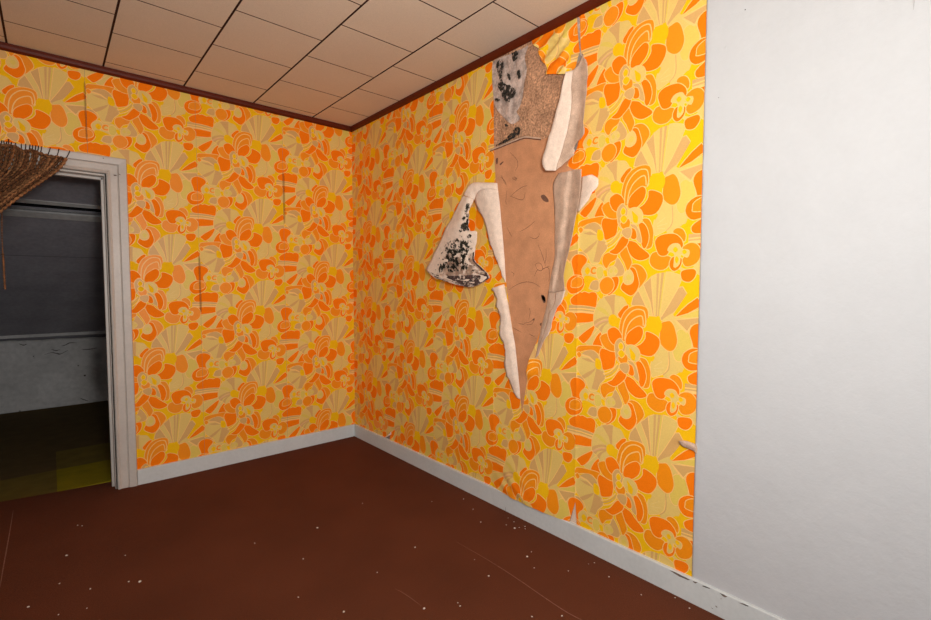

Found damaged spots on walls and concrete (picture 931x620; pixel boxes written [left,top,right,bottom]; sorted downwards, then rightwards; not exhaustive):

mould [495,50,521,102]
mould [496,124,520,146]
flaking render [493,41,580,150]
mould [432,203,489,287]